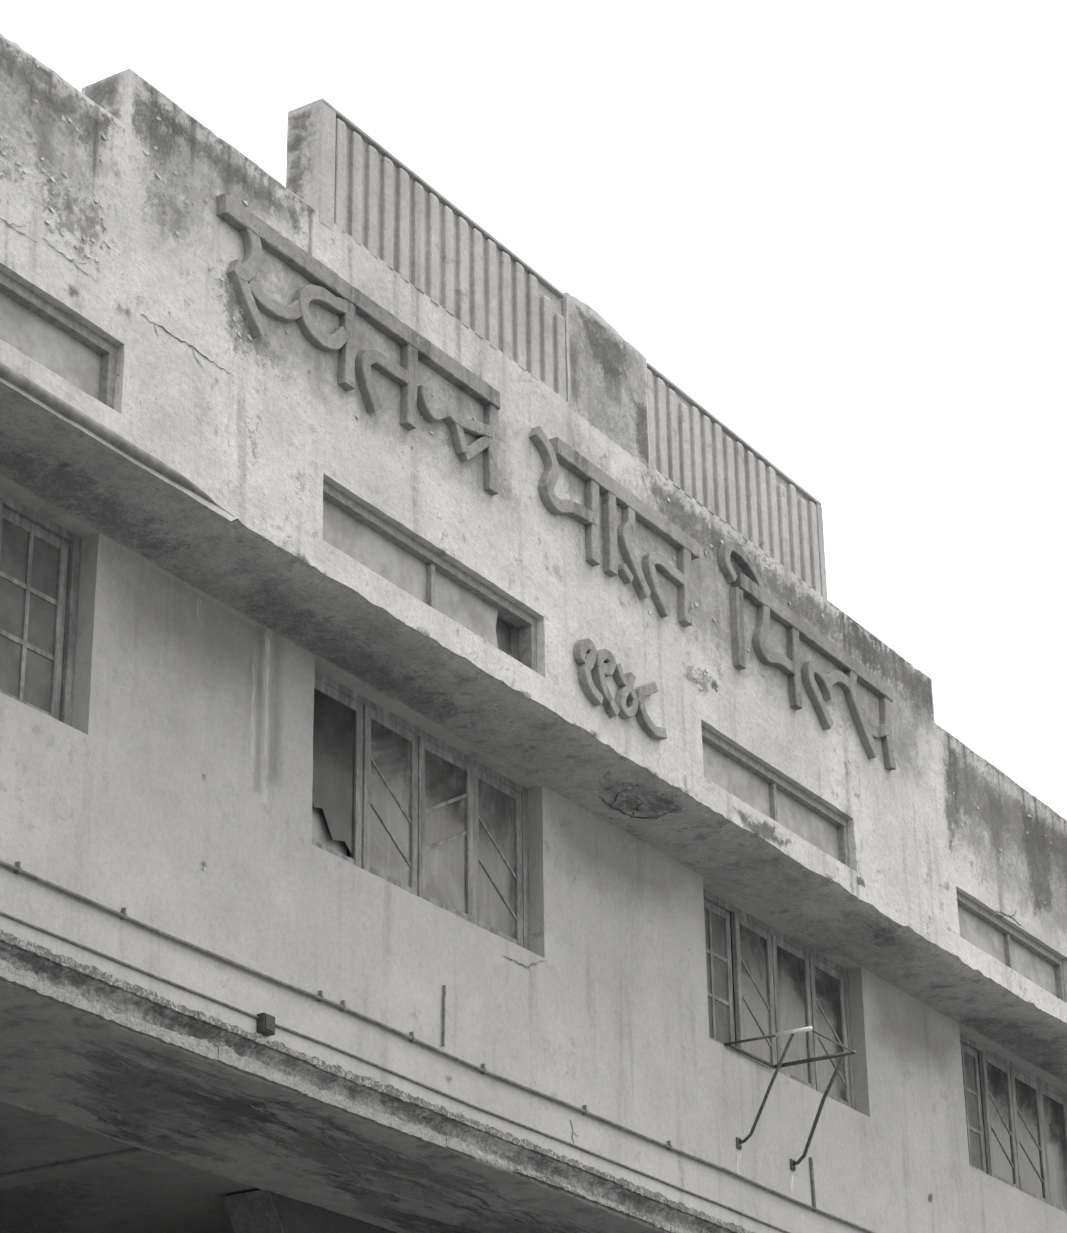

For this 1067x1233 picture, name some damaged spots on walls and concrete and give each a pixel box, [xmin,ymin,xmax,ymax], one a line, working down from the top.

leakage [0,41,110,142]
leakage [124,81,316,231]
crack [142,314,235,378]
leakage [579,307,626,377]
leakage [0,362,234,516]
peeling [0,930,755,1233]